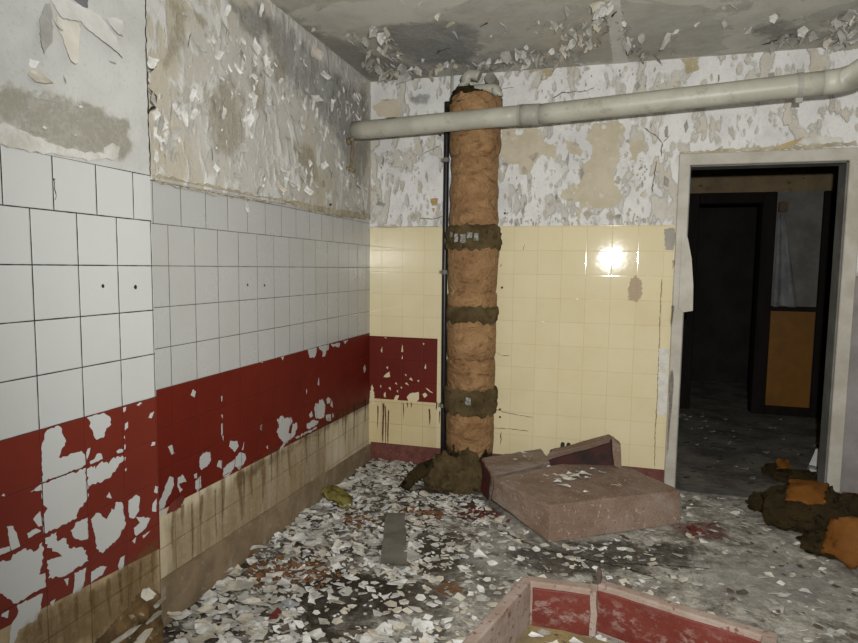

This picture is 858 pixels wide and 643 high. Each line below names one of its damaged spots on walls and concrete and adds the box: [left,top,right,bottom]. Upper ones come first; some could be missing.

peeling [28,0,124,83]
peeling [744,9,858,57]
spalling [0,120,120,161]
peeling [152,0,681,228]
spalling [680,136,858,154]
peeling [498,118,693,312]
peeling [308,340,348,358]
peeling [370,367,432,405]
crack [654,279,662,464]
peeling [277,397,334,451]
peeling [0,407,246,643]